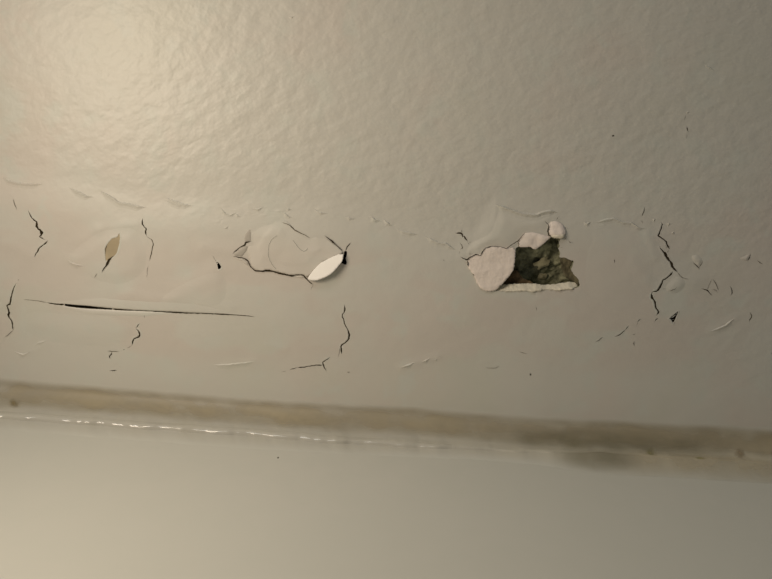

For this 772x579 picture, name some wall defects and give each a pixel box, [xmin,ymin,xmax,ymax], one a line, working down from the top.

crack [13,200,48,257]
spalling [94,232,122,278]
peeling [468,221,566,292]
crack [596,207,734,346]
crack [5,283,253,373]
crack [283,305,352,373]
damp [0,385,772,455]